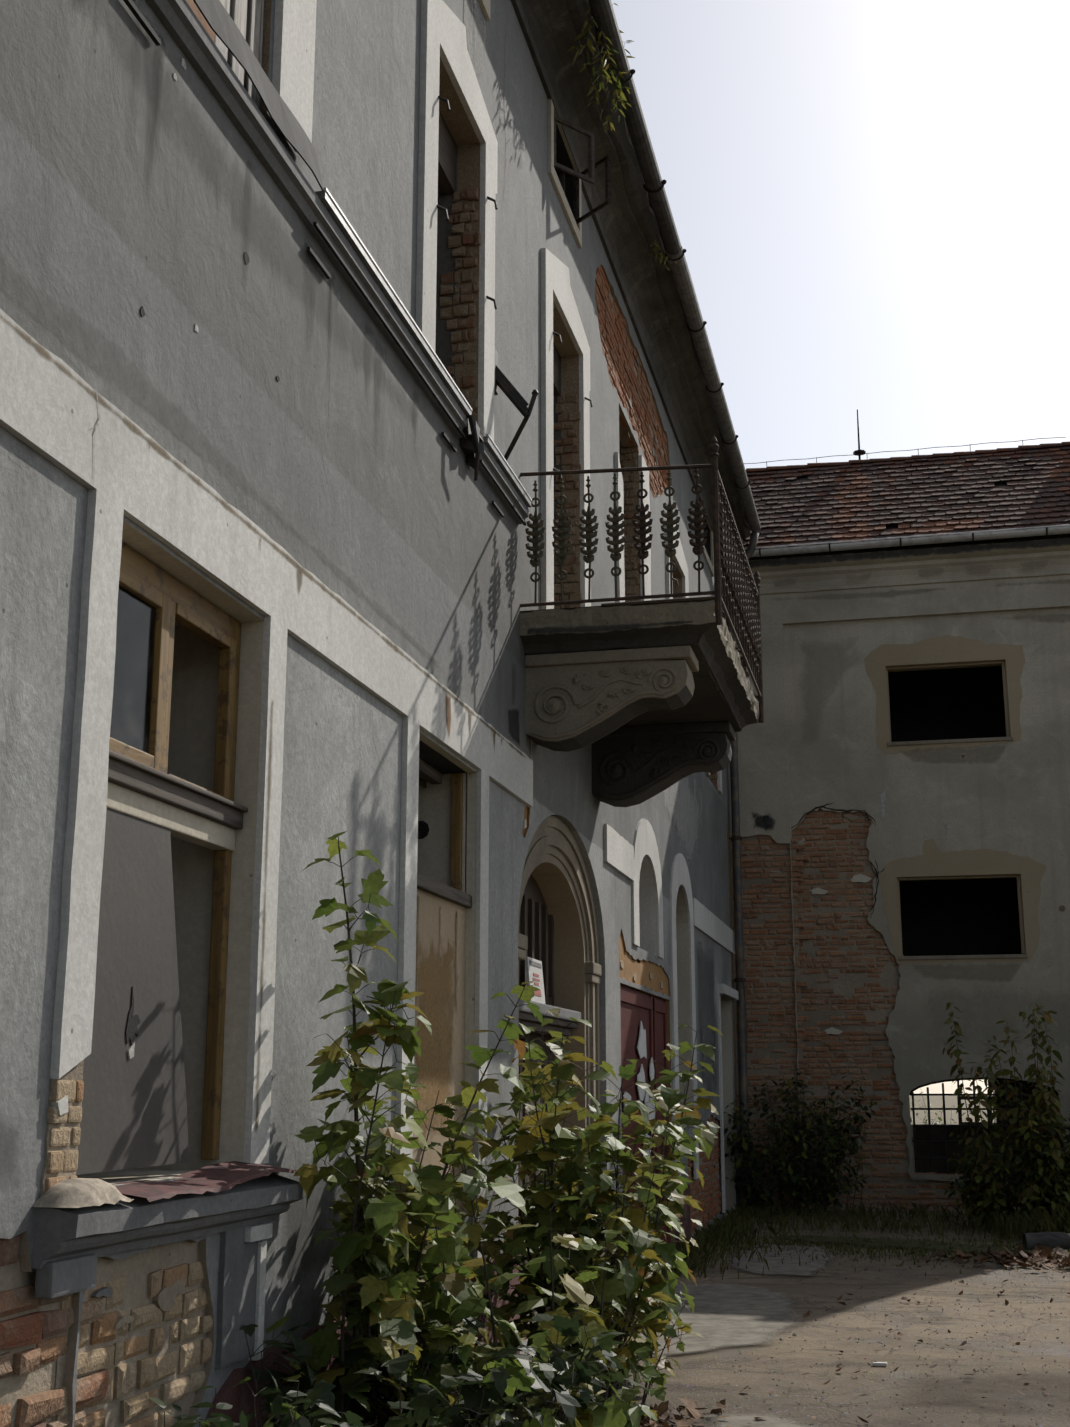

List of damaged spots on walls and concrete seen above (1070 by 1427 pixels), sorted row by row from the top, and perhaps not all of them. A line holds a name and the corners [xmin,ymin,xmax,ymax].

flaking render [595,266,669,497]
flaking render [731,809,970,1211]
flaking render [40,1059,84,1197]
flaking render [688,1116,722,1235]
flaking render [53,1240,213,1427]